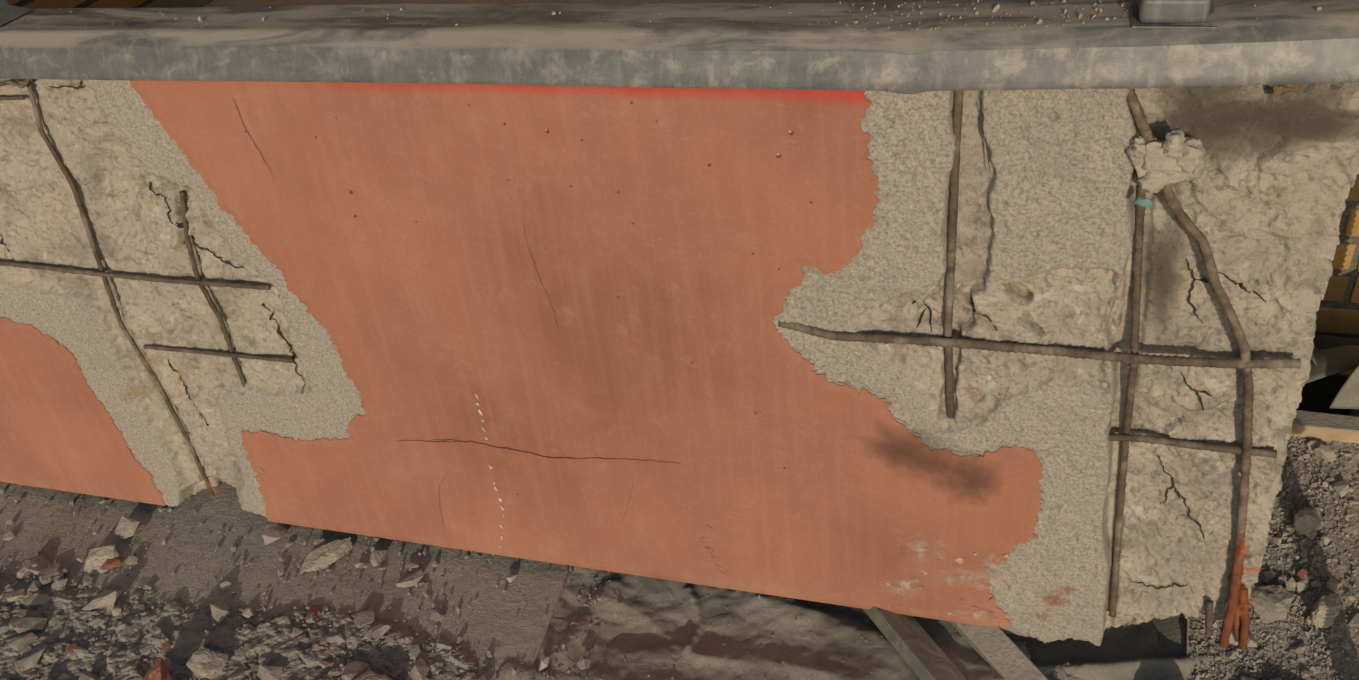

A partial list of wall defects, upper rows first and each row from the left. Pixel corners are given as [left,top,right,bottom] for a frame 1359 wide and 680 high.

spalling [0,79,365,518]
crack [406,439,680,527]
spalling [773,82,1359,646]